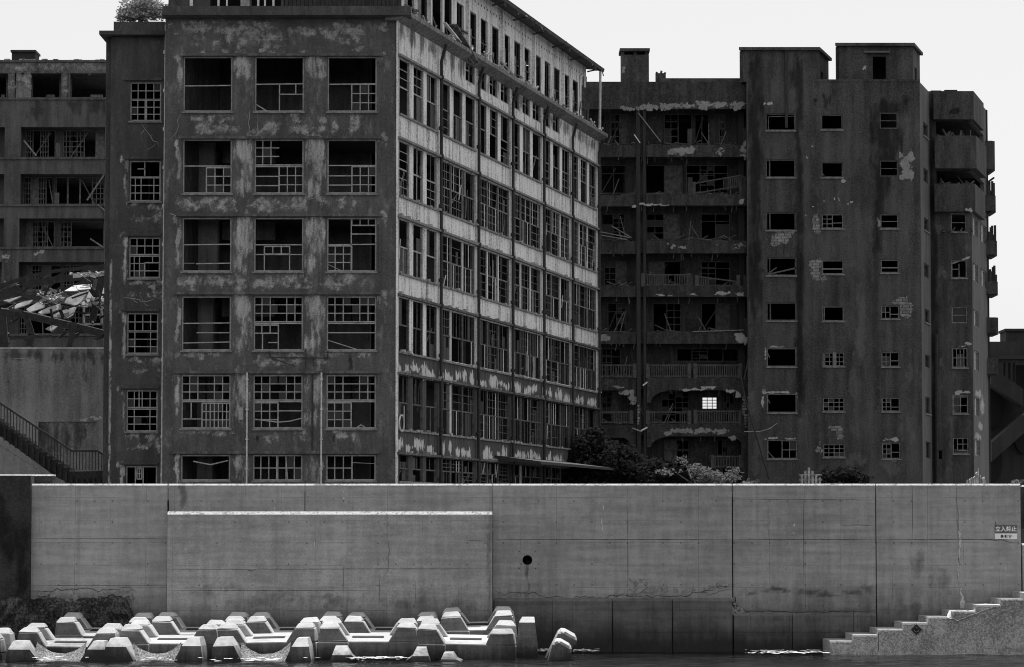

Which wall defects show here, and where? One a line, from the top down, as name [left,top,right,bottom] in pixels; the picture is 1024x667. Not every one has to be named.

spalling [620,100,746,111]
spalling [667,146,695,156]
water stain [749,56,763,301]
peeling [899,149,915,181]
spalling [805,197,853,234]
spalling [770,231,795,247]
spalling [808,258,827,282]
spalling [377,128,640,468]
water stain [795,244,804,398]
spalling [891,296,914,319]
peeling [663,386,797,476]
crack [493,584,865,613]